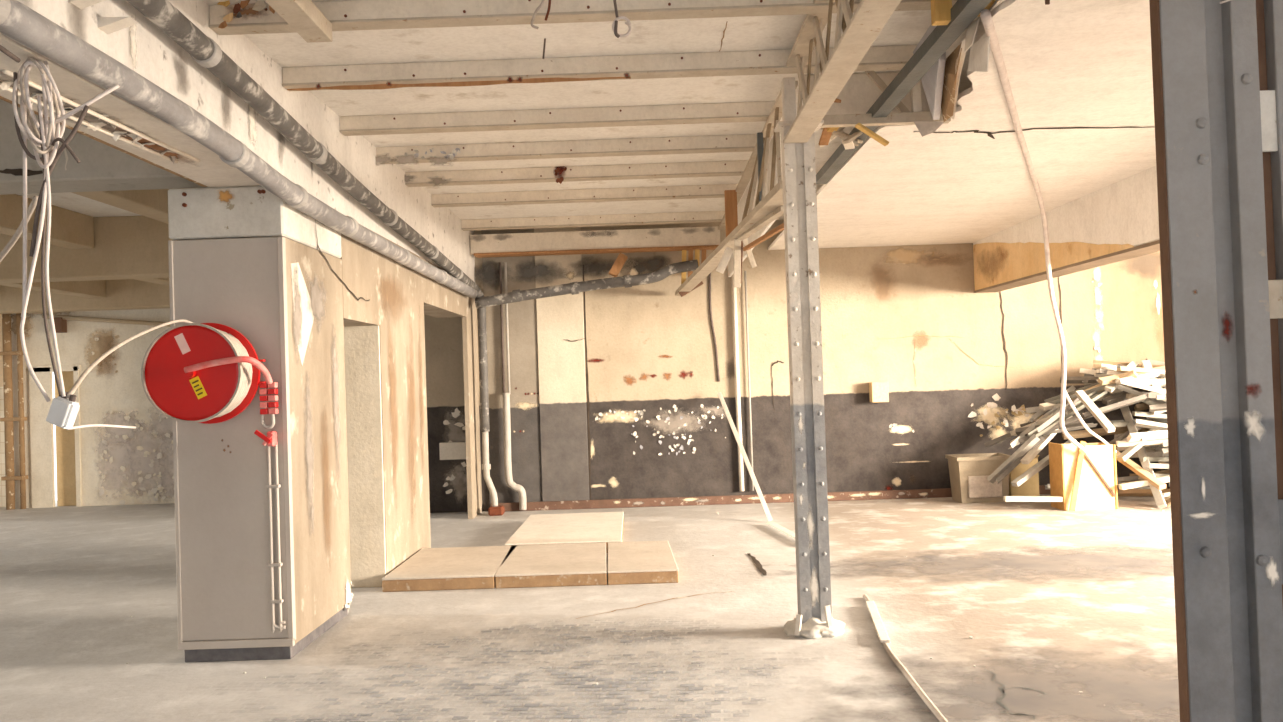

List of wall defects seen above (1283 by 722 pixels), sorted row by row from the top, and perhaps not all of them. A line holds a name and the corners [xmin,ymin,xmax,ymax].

crack [890,292,1012,390]
peeling [99,408,174,505]
flaking render [592,477,643,505]
peeling [595,404,726,455]